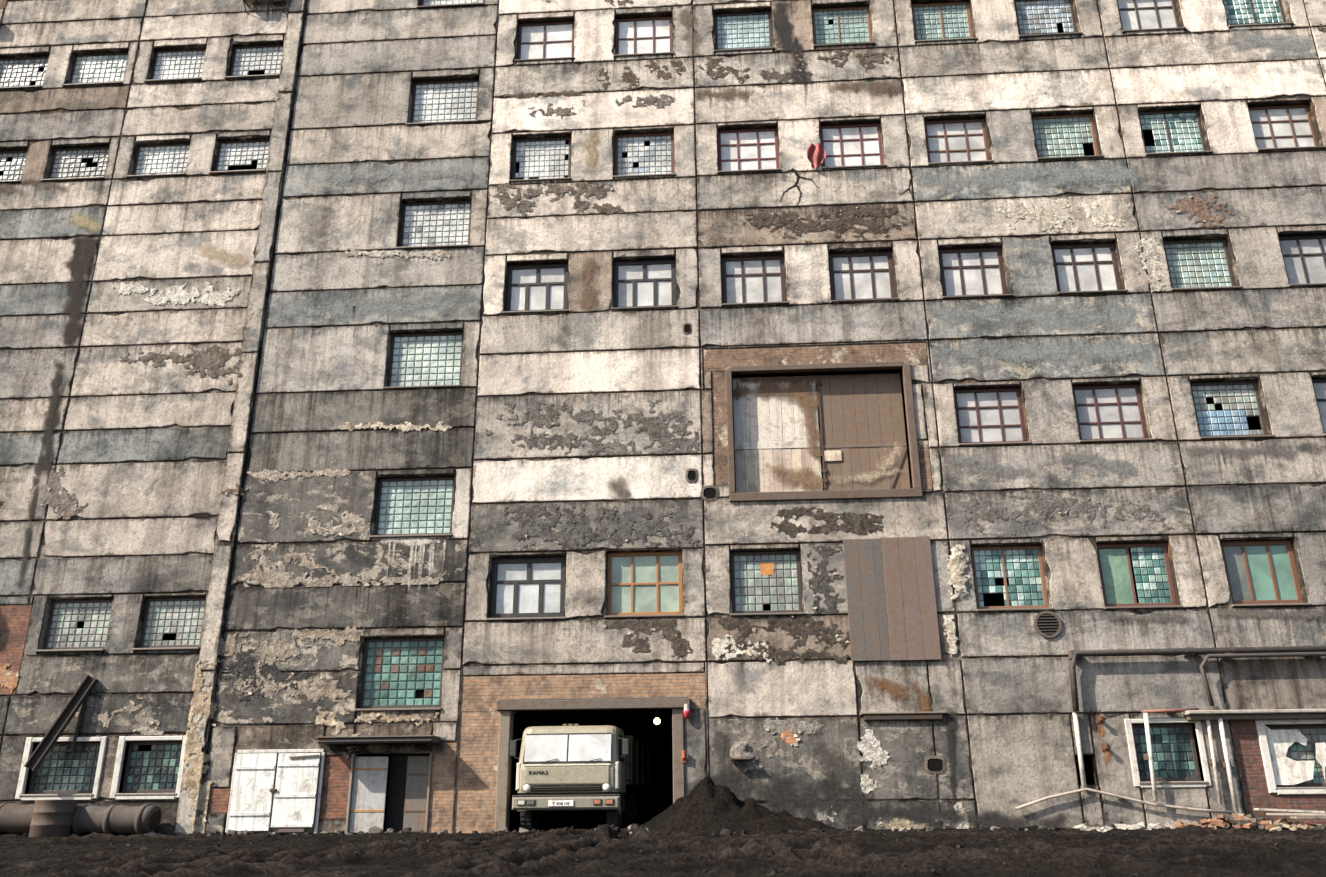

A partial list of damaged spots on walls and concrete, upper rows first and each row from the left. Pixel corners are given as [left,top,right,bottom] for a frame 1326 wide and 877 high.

flaking render [494,182,624,217]
crack [780,168,819,206]
leakage [63,236,98,344]
flaking render [485,399,719,501]
leakage [18,363,63,587]
flaking render [307,502,370,540]
flaking render [235,511,446,588]
flaking render [709,506,883,664]
flaking render [602,619,693,659]
spalling [0,663,19,693]
corrosion [866,678,931,711]